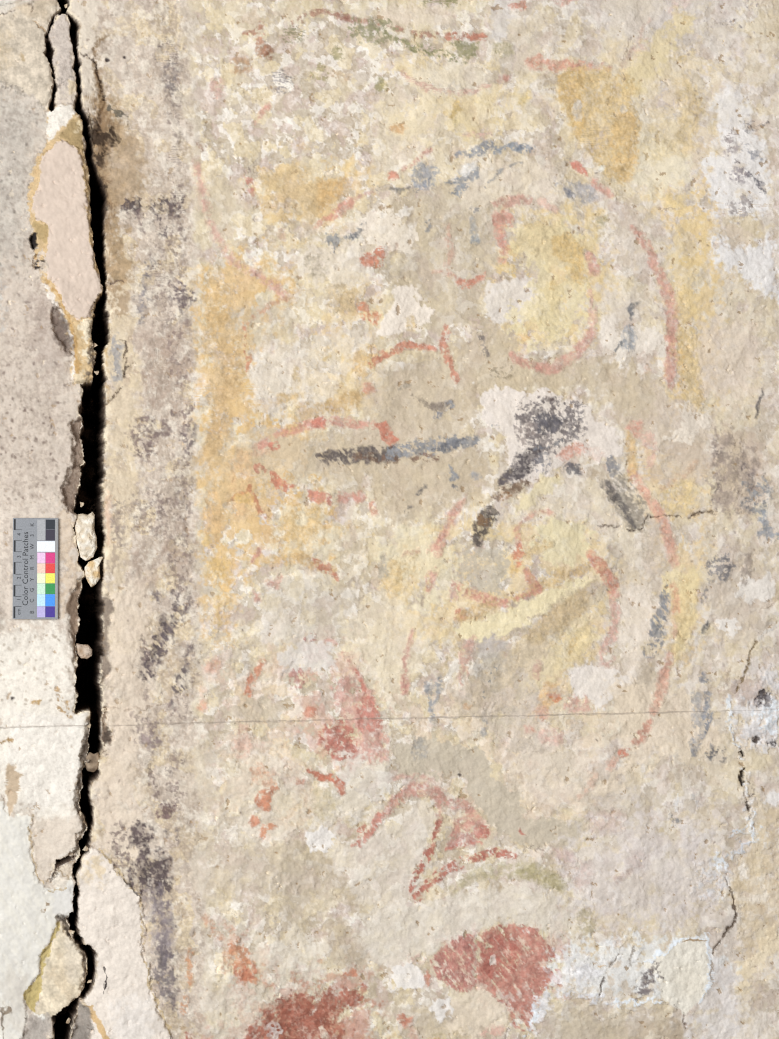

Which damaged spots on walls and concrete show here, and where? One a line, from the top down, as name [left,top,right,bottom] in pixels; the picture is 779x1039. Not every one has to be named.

spalling [0,0,108,385]
crack [30,0,164,1039]
crack [721,595,779,694]
crack [728,723,752,820]
peeling [0,762,174,1039]
spalling [612,931,716,1016]
crack [701,867,738,982]